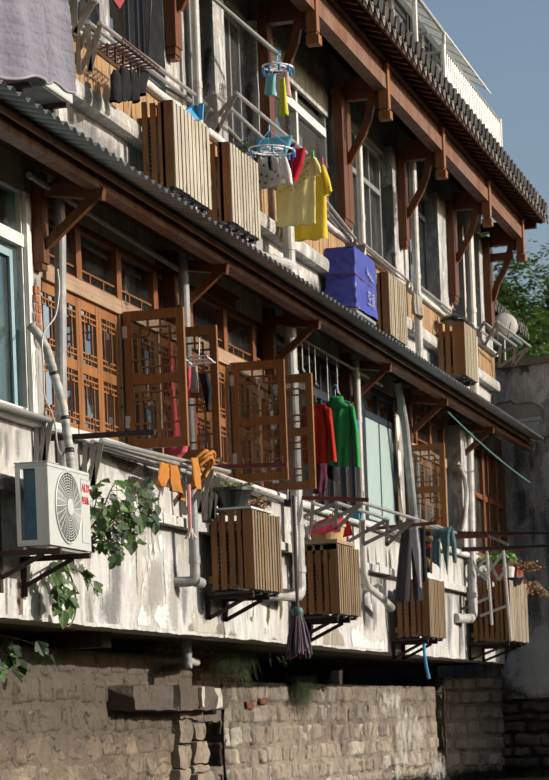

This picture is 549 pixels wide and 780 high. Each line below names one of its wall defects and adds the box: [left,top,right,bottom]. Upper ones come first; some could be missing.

leakage [88,551,121,624]
peeling [138,533,178,629]
leakage [380,691,424,772]